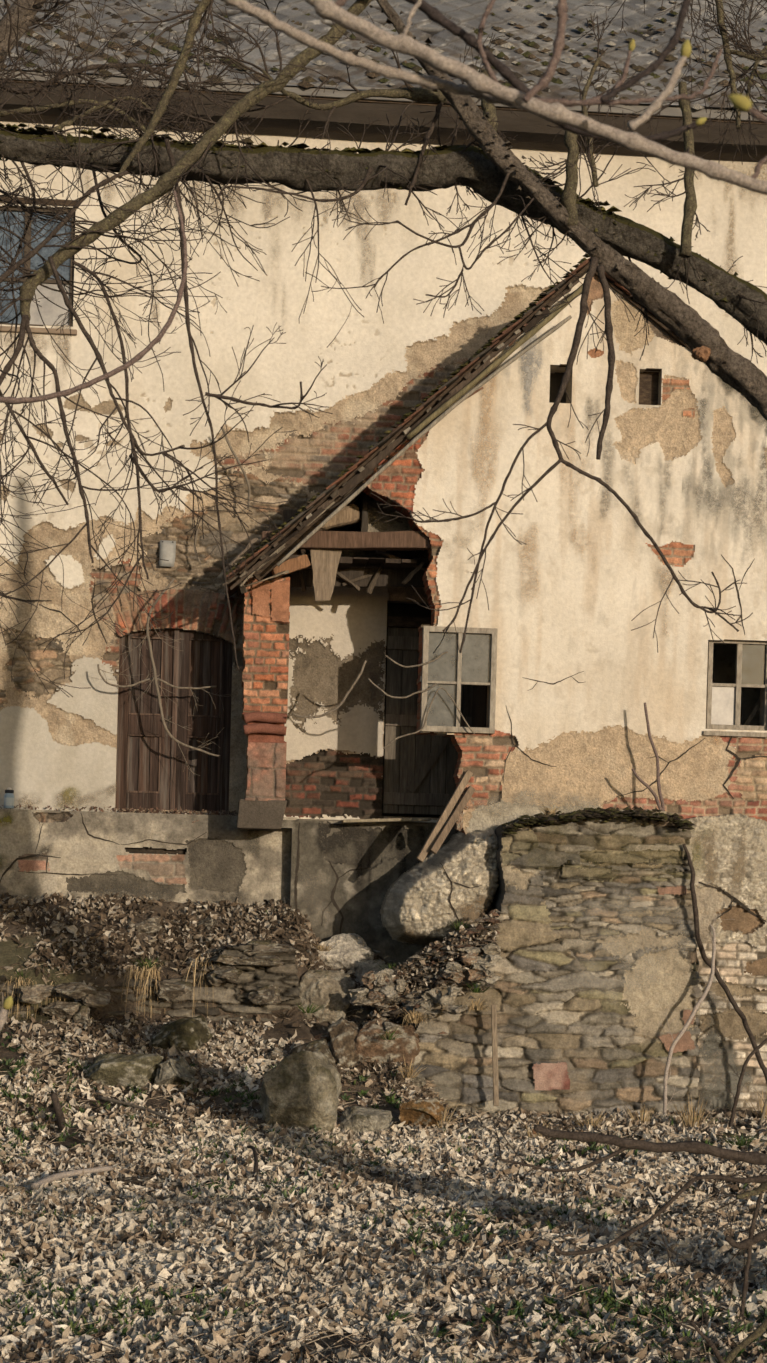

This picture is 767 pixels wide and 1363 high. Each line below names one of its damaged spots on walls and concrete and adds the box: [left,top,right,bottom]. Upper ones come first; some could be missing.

spalling [587,275,736,488]
spalling [0,284,550,824]
spalling [645,541,695,567]
crack [0,814,205,883]
spalling [66,836,247,895]
crack [294,823,368,934]
flaking render [284,634,767,870]
spalling [695,883,767,1111]